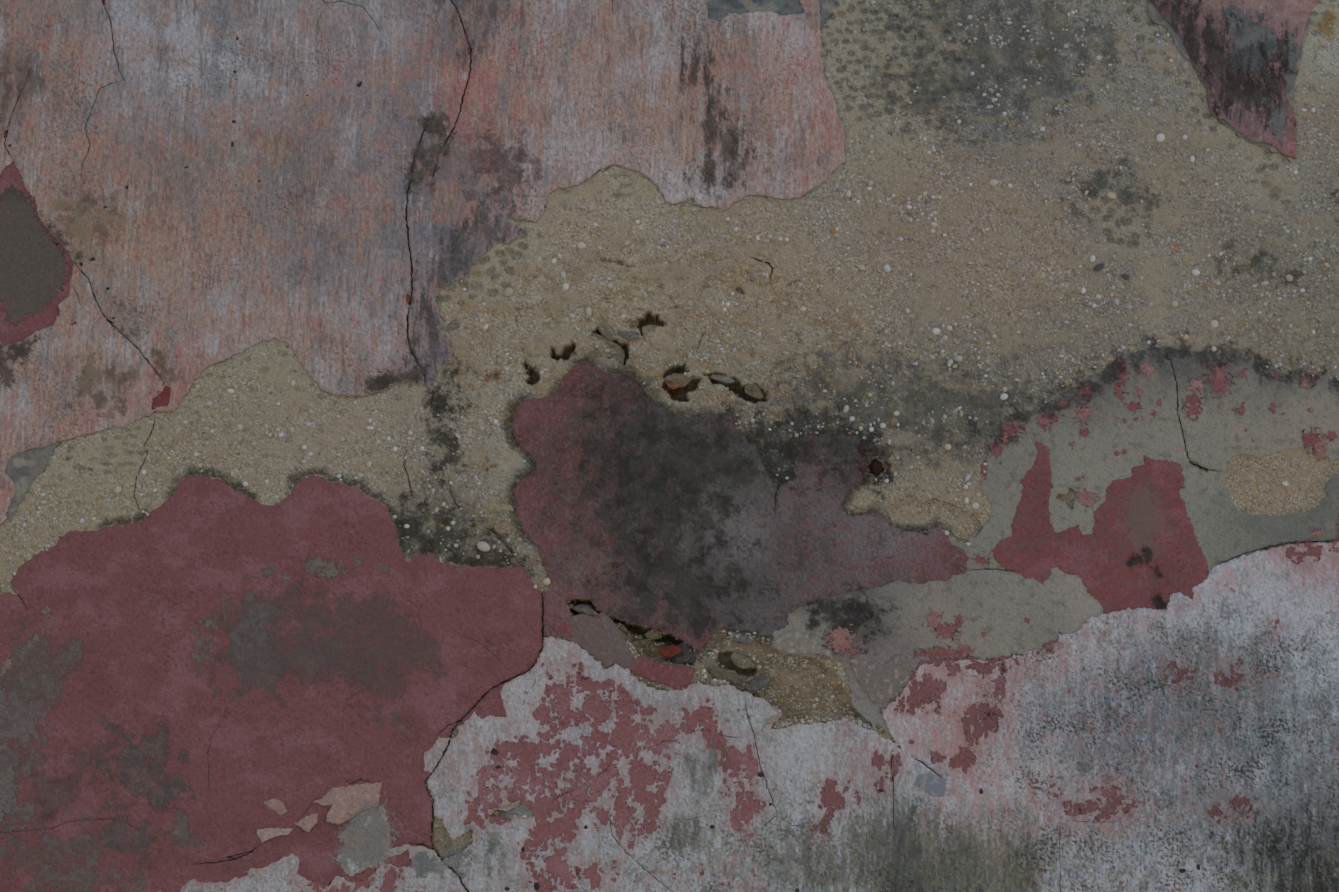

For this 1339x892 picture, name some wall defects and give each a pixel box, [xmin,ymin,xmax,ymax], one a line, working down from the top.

crack [81,0,123,166]
peeling [0,162,73,346]
crack [74,264,165,384]
crack [405,0,472,412]
peeling [992,441,1209,614]
peeling [257,828,294,843]
peeling [313,782,382,825]
crack [417,571,545,892]
peeling [463,662,766,892]
crack [609,810,672,892]
peeling [810,778,861,834]
peeling [948,675,1006,774]